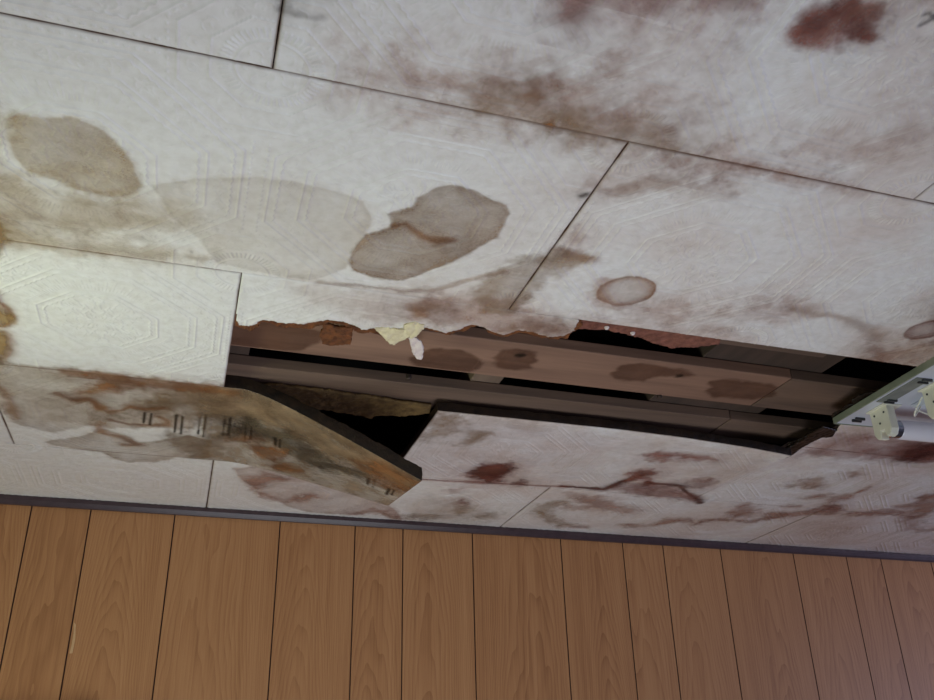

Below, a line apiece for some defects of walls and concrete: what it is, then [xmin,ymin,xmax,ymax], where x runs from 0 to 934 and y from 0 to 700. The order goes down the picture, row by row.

corrosion [789,0,876,46]
leakage [350,187,507,280]
leakage [597,277,656,304]
leakage [0,302,15,359]
peeling [319,322,353,346]
peeling [375,321,425,360]
leakage [646,452,707,461]
corrosion [852,437,934,462]
corrosion [470,464,513,484]
corrosion [555,470,702,504]
leakage [656,485,864,525]
leakage [848,495,934,518]